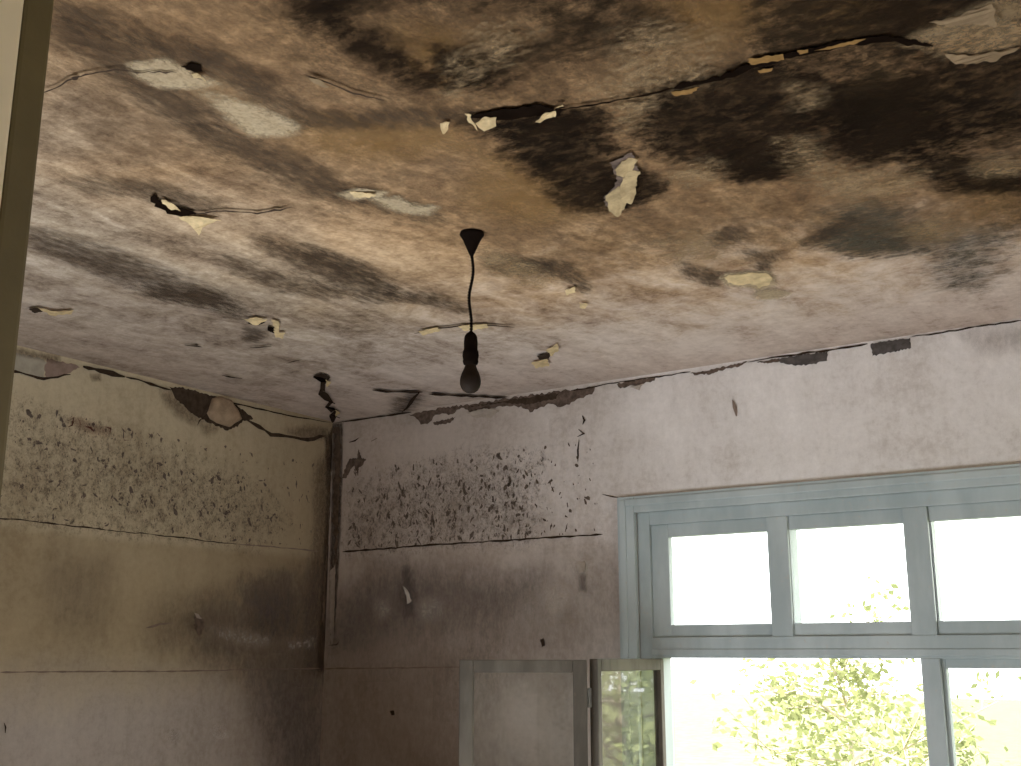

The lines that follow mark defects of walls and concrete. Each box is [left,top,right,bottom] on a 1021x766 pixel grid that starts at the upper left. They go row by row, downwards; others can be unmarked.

peeling [908,0,1021,64]
crack [440,35,933,134]
damp [60,0,1021,288]
peeling [604,153,641,217]
damp [153,288,247,320]
damp [224,255,339,297]
damp [297,244,467,314]
crack [289,360,340,423]
flaking render [14,317,1021,442]